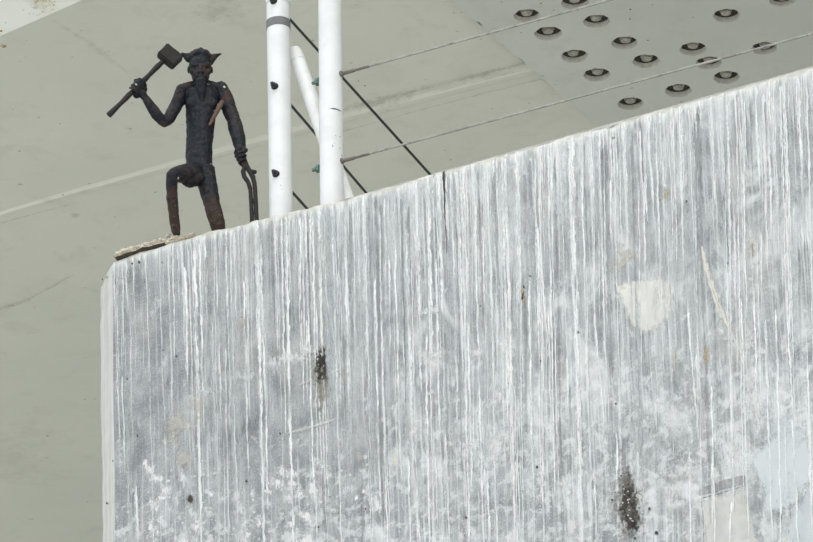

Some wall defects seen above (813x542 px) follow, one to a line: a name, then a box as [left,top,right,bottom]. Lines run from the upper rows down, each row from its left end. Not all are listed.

leakage [113,258,135,366]
leakage [159,70,813,542]
peeling [617,278,674,332]
leakage [116,356,125,461]
corrosion [314,347,328,393]